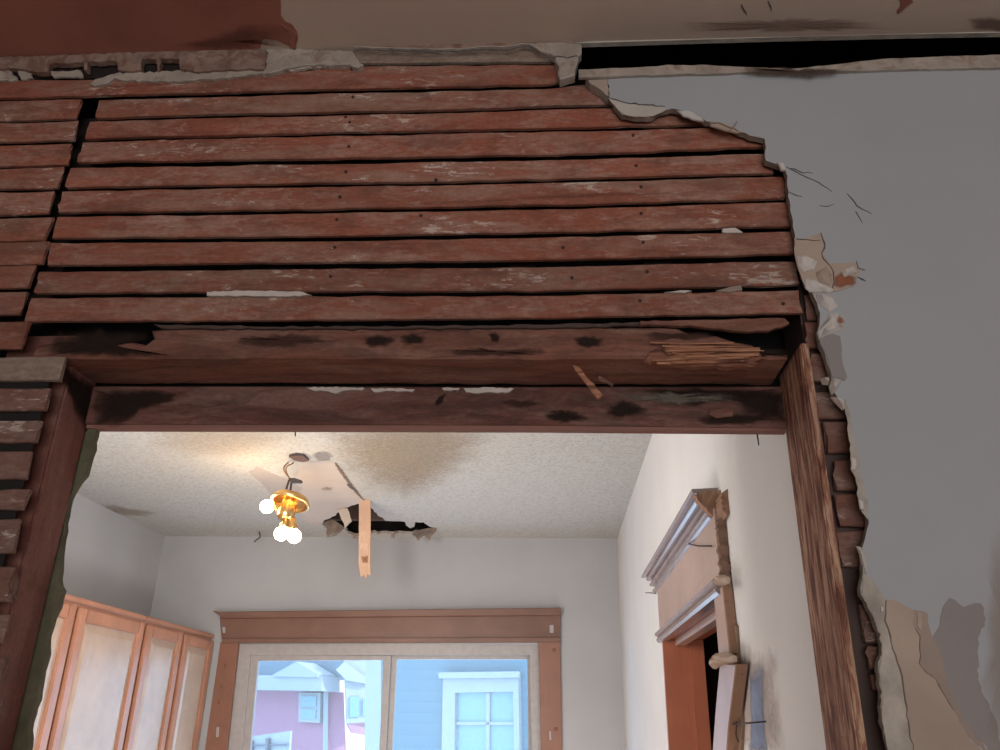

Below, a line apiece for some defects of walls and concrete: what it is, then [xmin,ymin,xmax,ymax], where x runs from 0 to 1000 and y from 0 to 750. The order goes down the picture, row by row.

crack [787,167,871,223]
flaking render [794,233,866,293]
water stain [366,334,422,346]
water stain [456,333,534,355]
water stain [577,337,600,347]
peeling [307,386,415,394]
water stain [547,410,586,422]
water stain [609,401,644,416]
peeling [819,334,868,520]
spalling [324,521,359,533]
spalling [371,521,434,532]
peeling [856,546,1000,750]